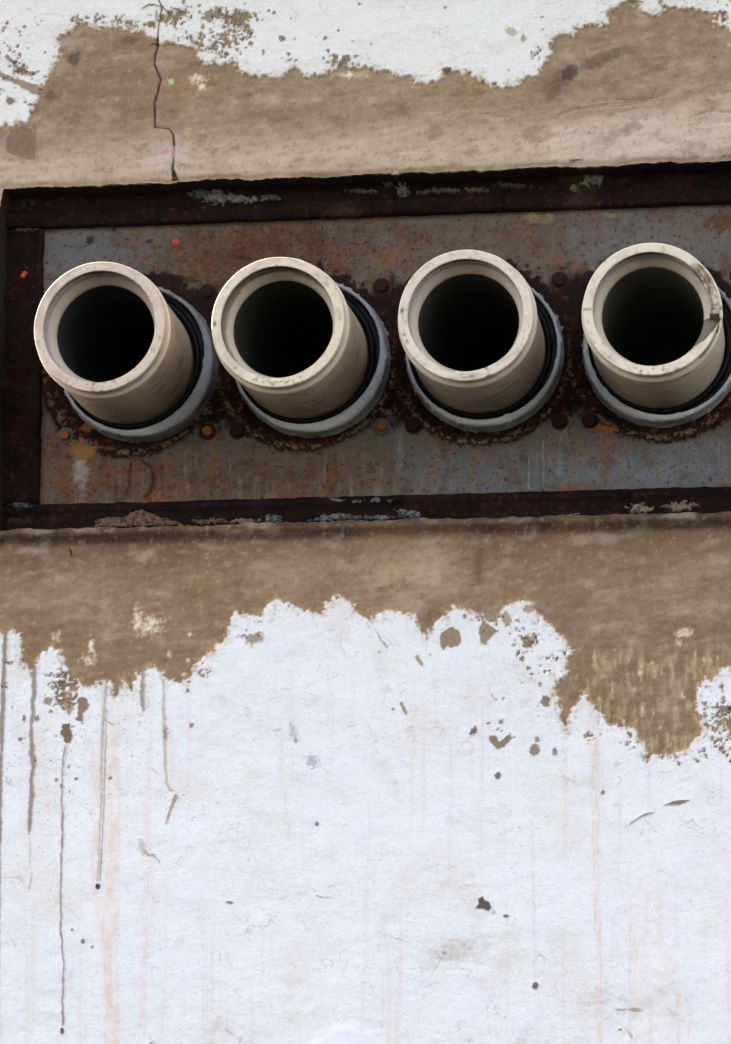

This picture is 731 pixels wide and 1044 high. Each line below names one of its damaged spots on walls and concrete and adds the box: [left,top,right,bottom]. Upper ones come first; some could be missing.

leakage [5,122,37,159]
crack [141,0,185,183]
corrosion [519,211,558,228]
leakage [537,40,646,111]
corrosion [599,211,621,222]
corrosion [41,219,731,500]
leakage [0,627,10,986]
leakage [26,664,38,890]
leakage [58,743,69,1035]
leakage [95,680,114,889]
leakage [138,667,147,712]
leakage [160,677,179,824]